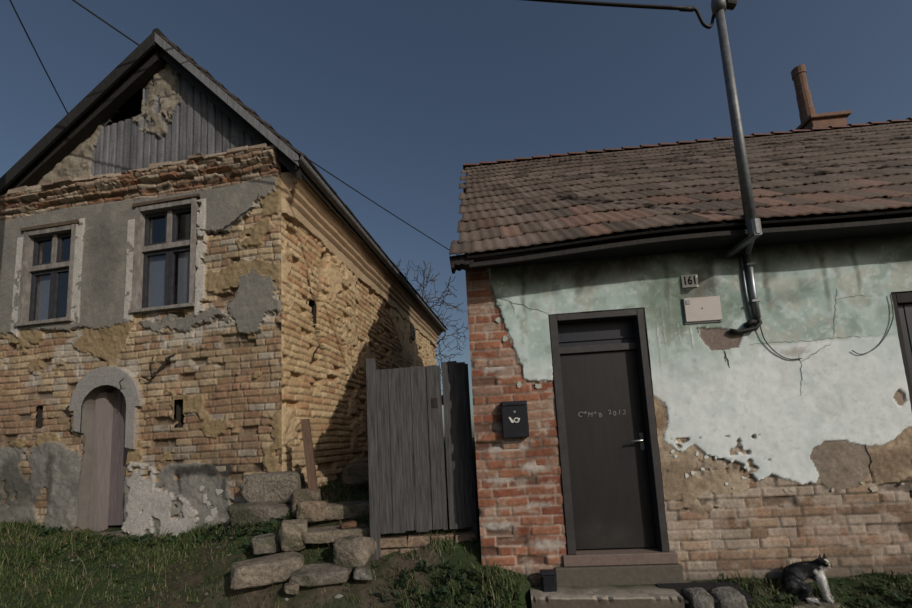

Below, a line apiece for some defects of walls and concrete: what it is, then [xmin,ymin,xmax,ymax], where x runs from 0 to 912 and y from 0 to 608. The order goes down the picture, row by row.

spalling [133,64,182,138]
spalling [34,121,106,186]
spalling [0,176,437,539]
spalling [465,268,567,585]
spalling [696,327,744,351]
crack [751,293,881,396]
spalling [893,389,907,406]
spalling [653,396,912,583]